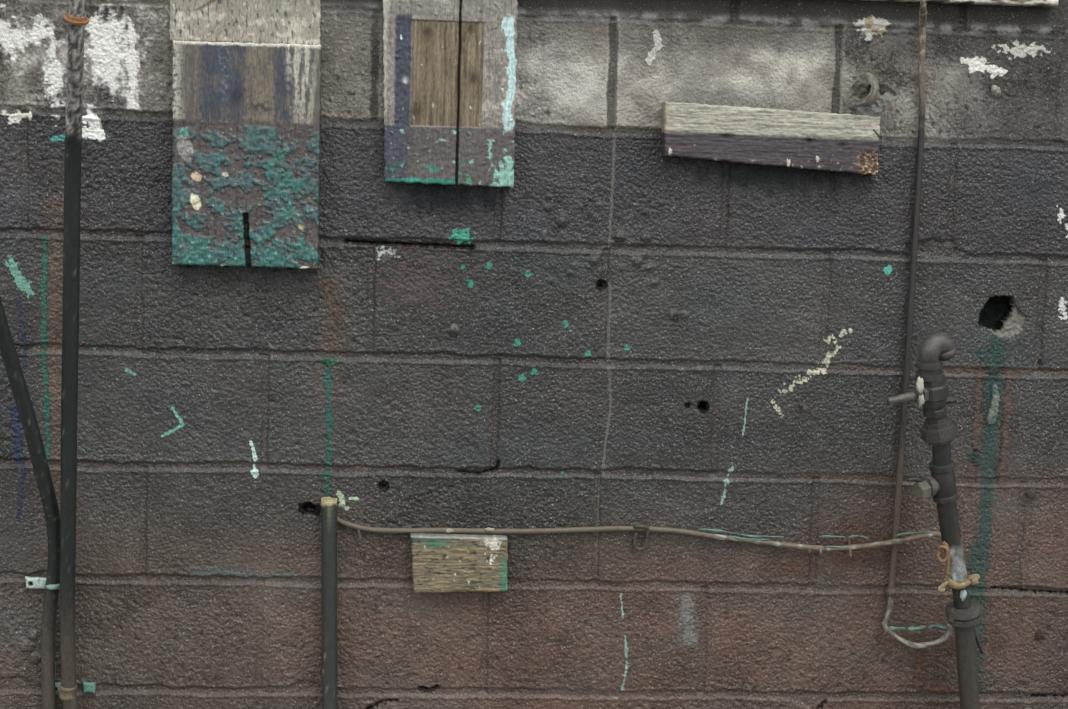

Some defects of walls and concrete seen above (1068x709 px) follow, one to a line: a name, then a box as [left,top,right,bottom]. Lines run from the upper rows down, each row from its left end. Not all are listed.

hole [978,296,1025,338]